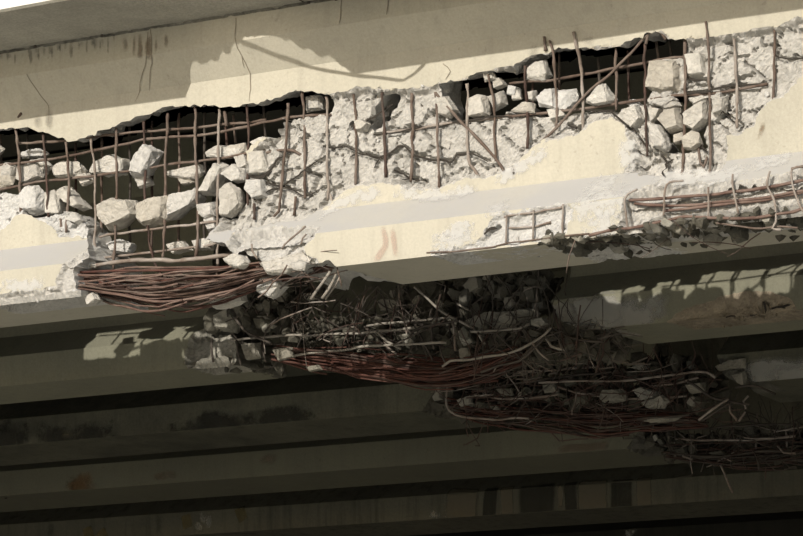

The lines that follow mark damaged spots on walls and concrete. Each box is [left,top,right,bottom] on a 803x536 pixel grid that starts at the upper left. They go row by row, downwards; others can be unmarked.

crack [135,28,152,101]
crack [235,24,251,96]
spalling [210,16,803,265]
spalling [0,192,89,239]
spalling [0,250,110,314]
spalling [667,291,803,330]
spalling [184,328,252,375]